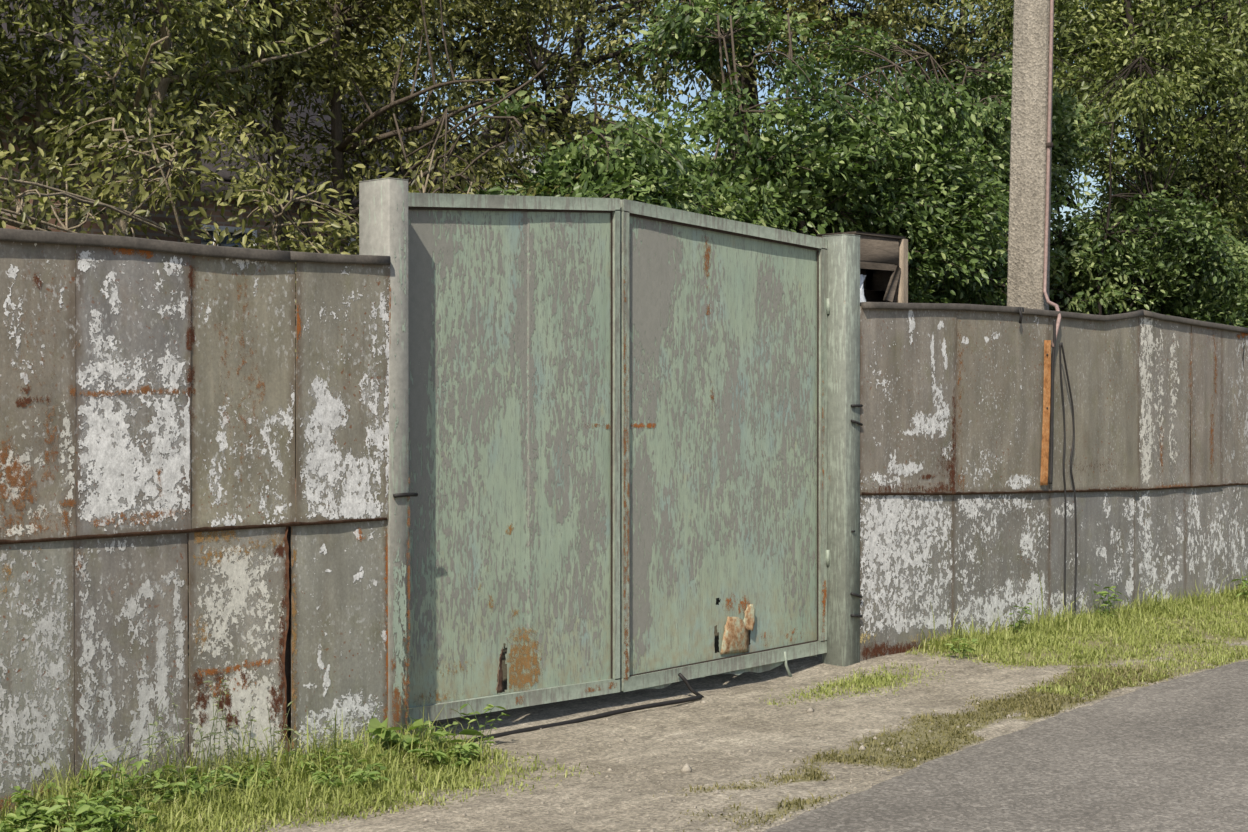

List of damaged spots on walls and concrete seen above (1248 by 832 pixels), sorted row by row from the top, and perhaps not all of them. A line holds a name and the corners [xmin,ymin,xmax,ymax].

rust [0,382,77,549]
rust [70,367,196,436]
rust [93,470,186,527]
peeling [0,200,610,793]
peeling [629,217,817,674]
peeling [860,310,1248,637]
rust [192,530,298,749]
rust [507,610,541,704]